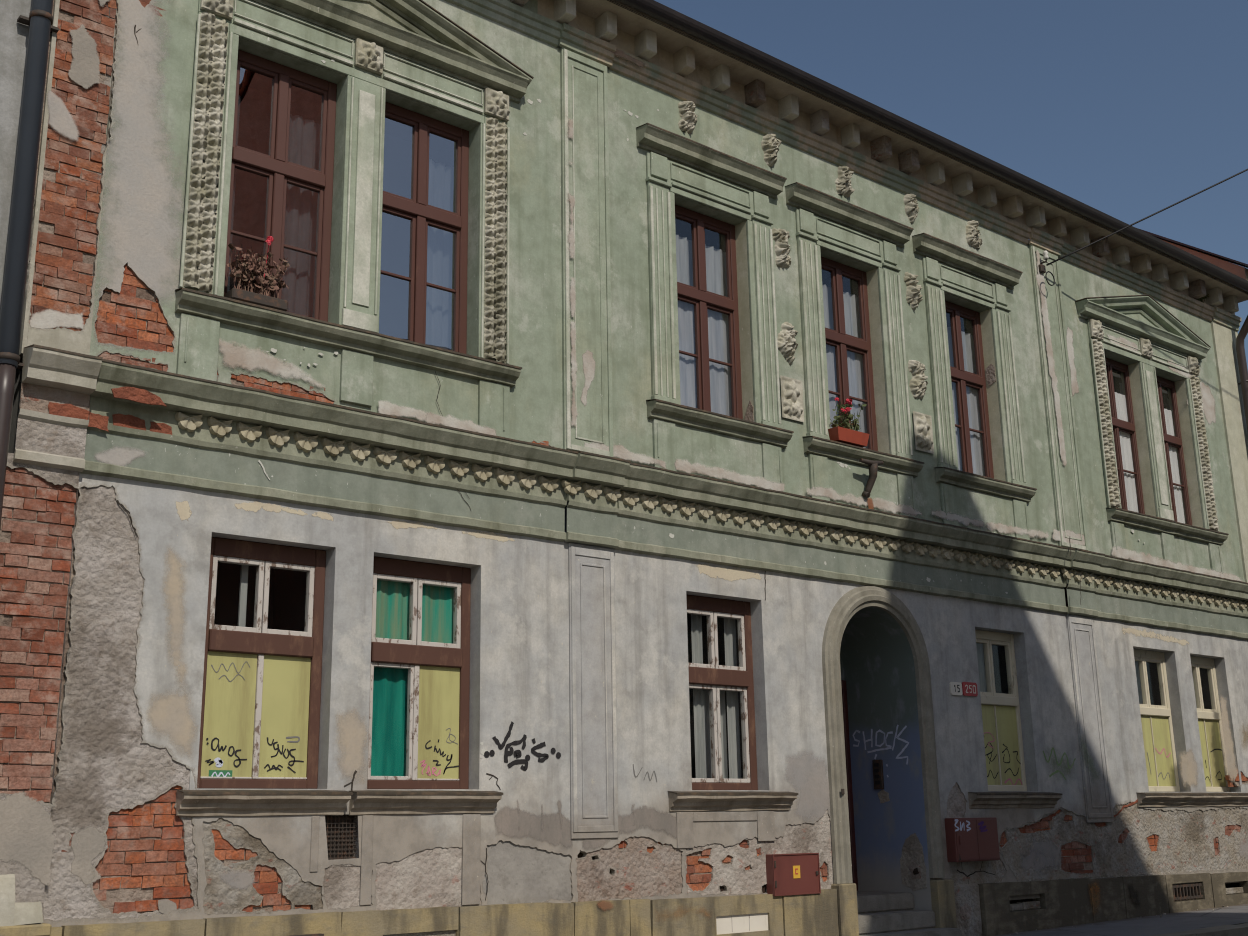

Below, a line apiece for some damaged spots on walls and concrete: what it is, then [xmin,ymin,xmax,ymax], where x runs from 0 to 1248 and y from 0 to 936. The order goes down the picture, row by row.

flaking render [27,0,183,372]
flaking render [48,387,172,435]
peeling [217,339,338,404]
peeling [96,447,145,466]
flaking render [0,465,834,921]
peeling [1220,697,1248,787]
flaking render [949,802,1248,885]